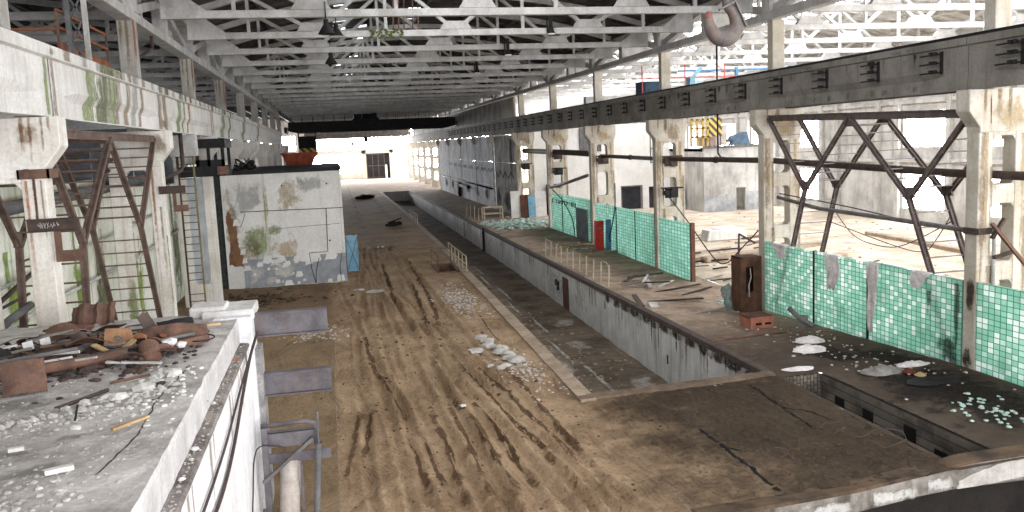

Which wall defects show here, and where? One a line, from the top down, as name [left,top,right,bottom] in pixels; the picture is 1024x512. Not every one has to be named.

leakage [82,64,144,126]
corrosion [18,117,49,146]
peeling [224,205,337,286]
crack [749,385,833,430]
crack [699,429,782,491]